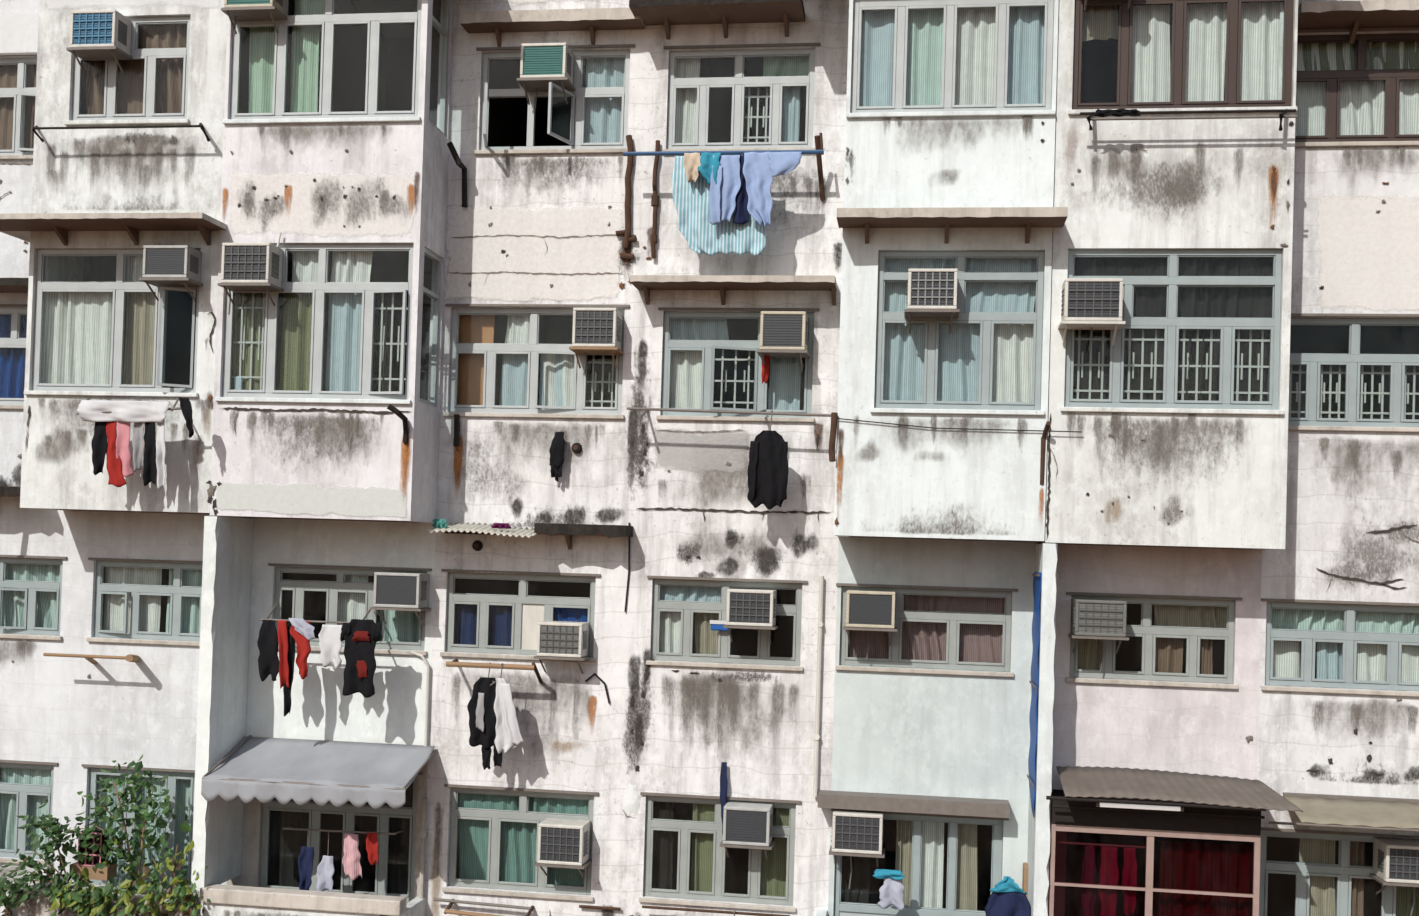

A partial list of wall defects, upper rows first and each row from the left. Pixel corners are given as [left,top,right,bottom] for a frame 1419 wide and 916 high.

water stain [47,132,195,180]
water stain [1068,133,1205,214]
corrosion [1269,166,1278,230]
water stain [0,465,21,486]
water stain [39,398,95,460]
corrosion [401,427,410,486]
corrosion [453,437,463,483]
water stain [1068,413,1242,467]
crack [1366,525,1419,543]
crack [1317,568,1407,592]
corrosion [588,696,597,724]
water stain [623,651,796,772]